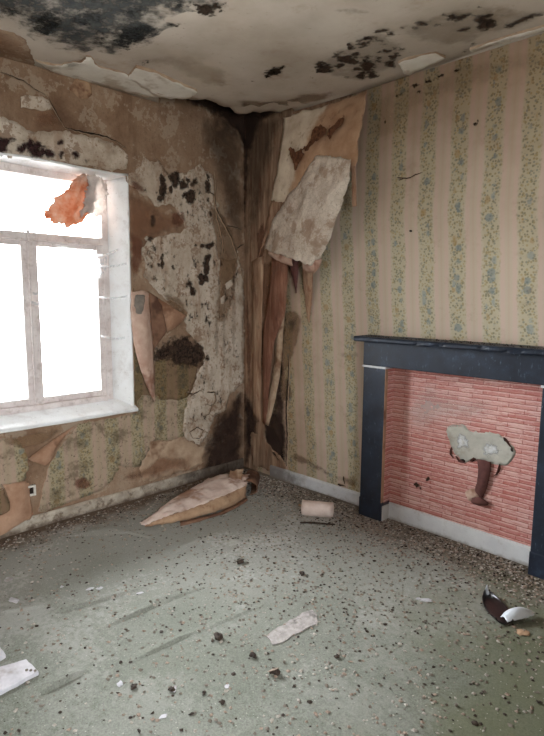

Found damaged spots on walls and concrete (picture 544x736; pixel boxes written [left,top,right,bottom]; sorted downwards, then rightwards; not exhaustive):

water stain [0,0,223,54]
water stain [264,65,285,78]
water stain [315,29,405,79]
water stain [442,6,543,32]
crack [1,72,127,149]
peeling [0,94,352,482]
water stain [154,335,223,421]
water stain [205,312,300,468]
peeling [0,481,33,536]